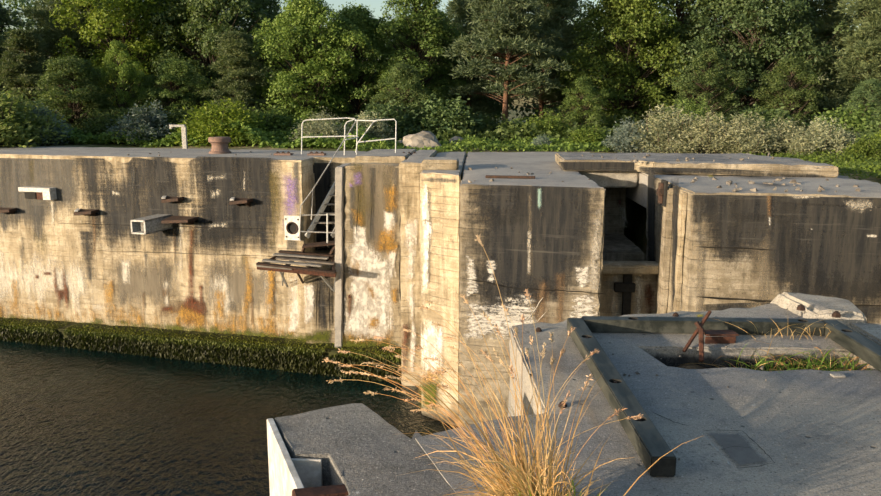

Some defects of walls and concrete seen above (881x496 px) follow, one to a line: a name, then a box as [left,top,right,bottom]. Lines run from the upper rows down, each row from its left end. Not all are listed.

rust [36,272,68,316]
water stain [0,156,276,314]
rust [161,227,275,331]
peeling [346,226,396,341]
rust [375,227,397,272]
peeling [384,211,394,234]
water stain [465,184,601,332]
water stain [559,162,881,324]